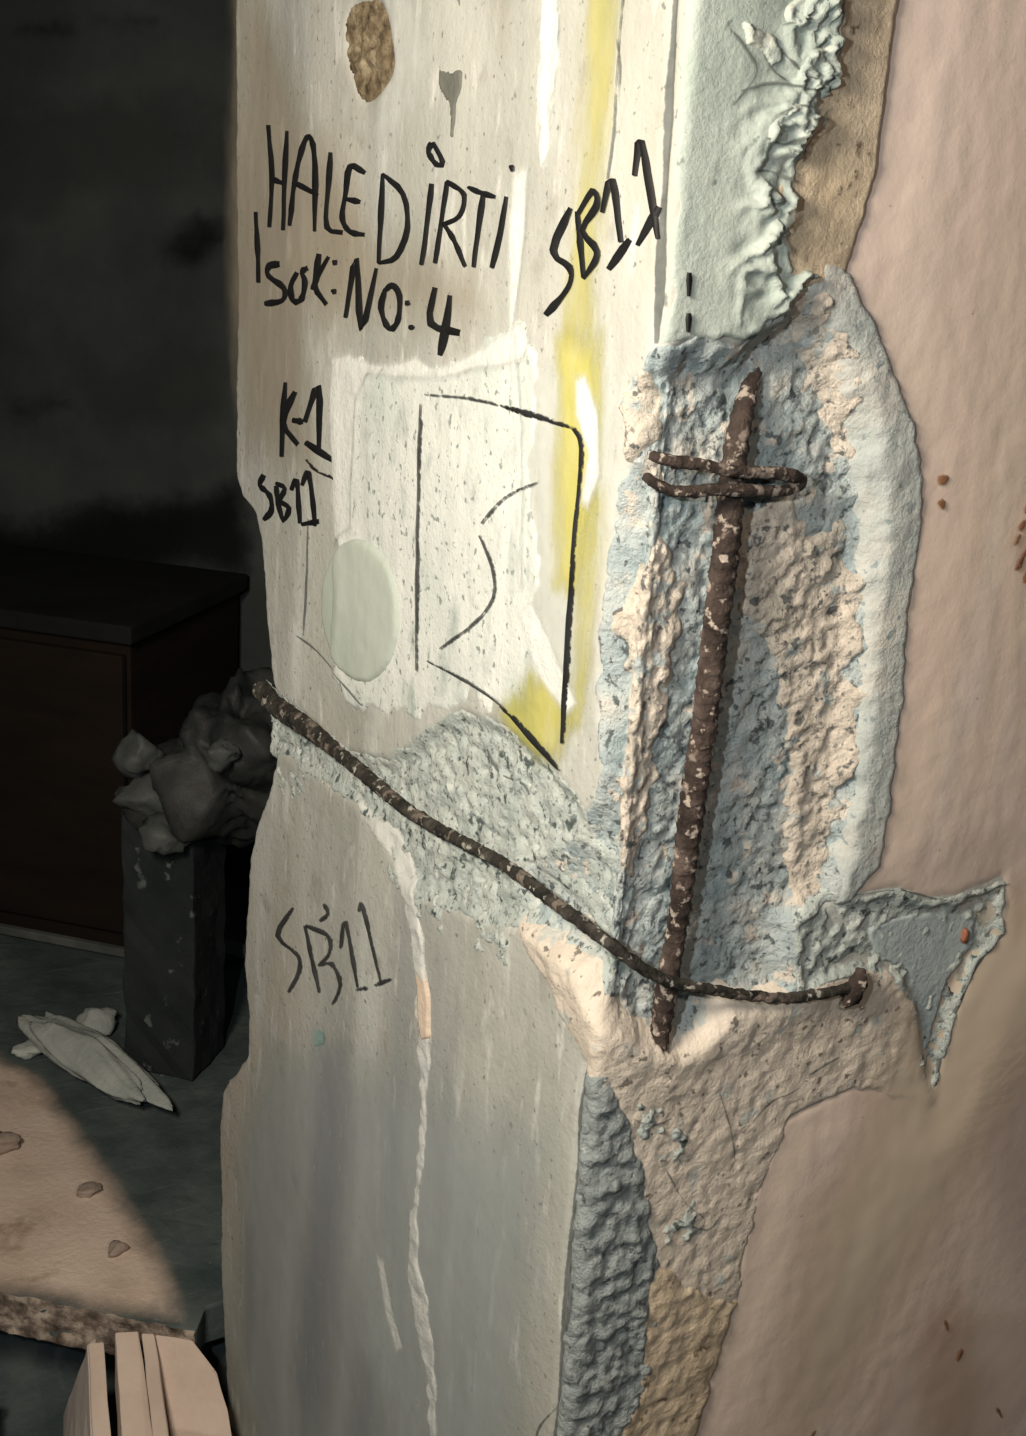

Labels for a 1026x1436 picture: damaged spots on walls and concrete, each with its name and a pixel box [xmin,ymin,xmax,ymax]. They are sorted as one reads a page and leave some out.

spalling [270,0,1026,1436]
corrosion [1015,507,1026,583]